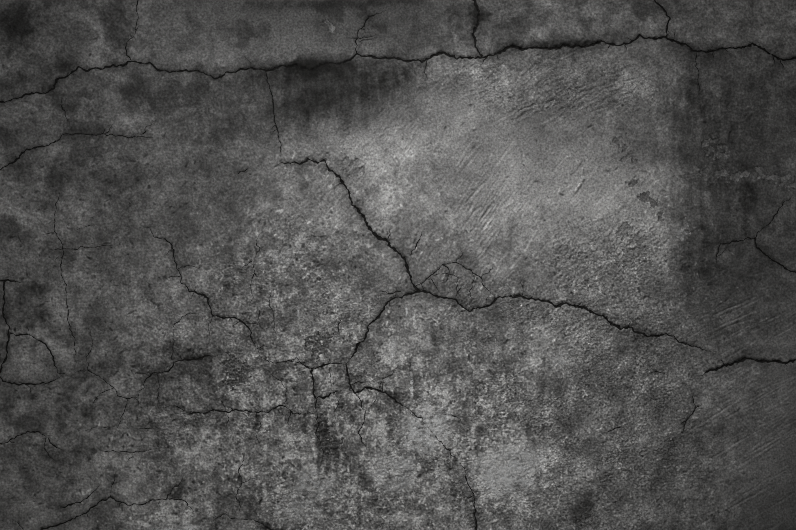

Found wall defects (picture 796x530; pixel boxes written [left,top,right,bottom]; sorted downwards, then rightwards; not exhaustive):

crack [0,0,796,152]
crack [0,124,153,170]
crack [716,198,796,273]
crack [0,158,711,530]
crack [702,357,796,376]